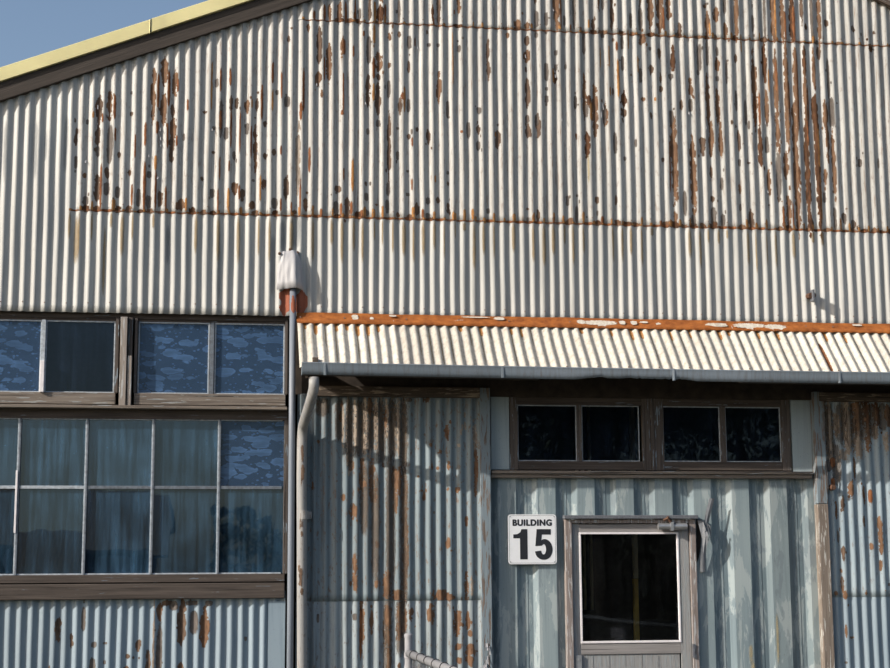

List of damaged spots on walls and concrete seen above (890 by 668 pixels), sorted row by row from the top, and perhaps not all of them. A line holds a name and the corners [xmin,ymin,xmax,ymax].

corrosion [68,0,890,268]